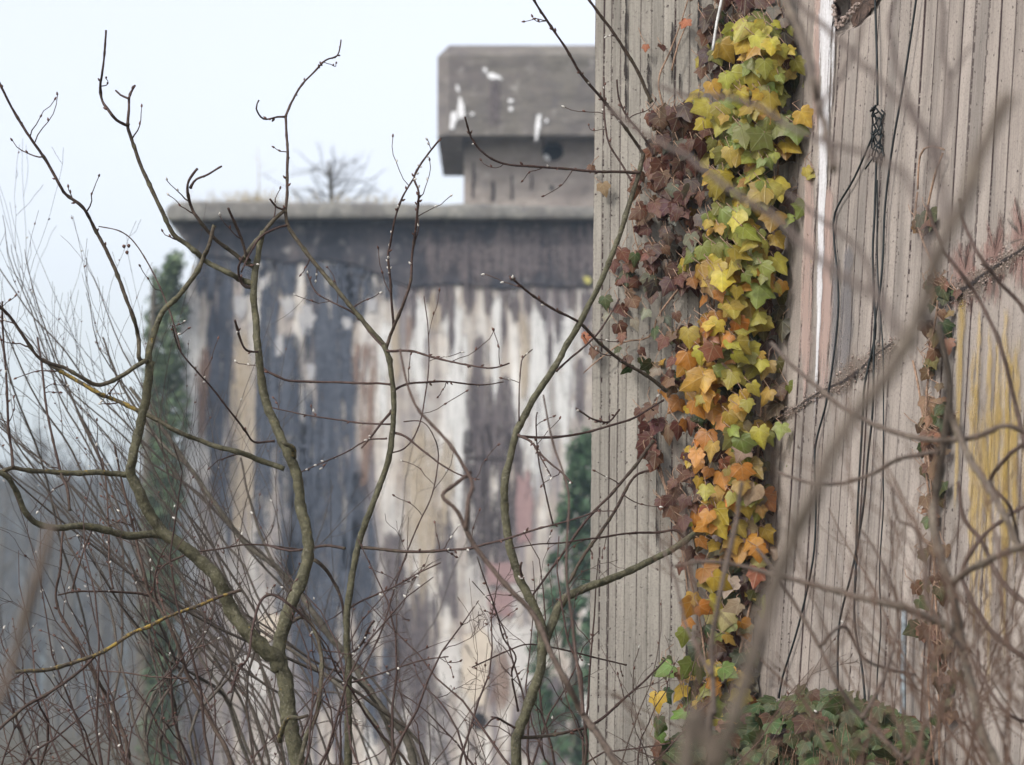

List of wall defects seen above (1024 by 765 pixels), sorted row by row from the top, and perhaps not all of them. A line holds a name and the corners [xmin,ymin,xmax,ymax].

leakage [179,221,593,765]